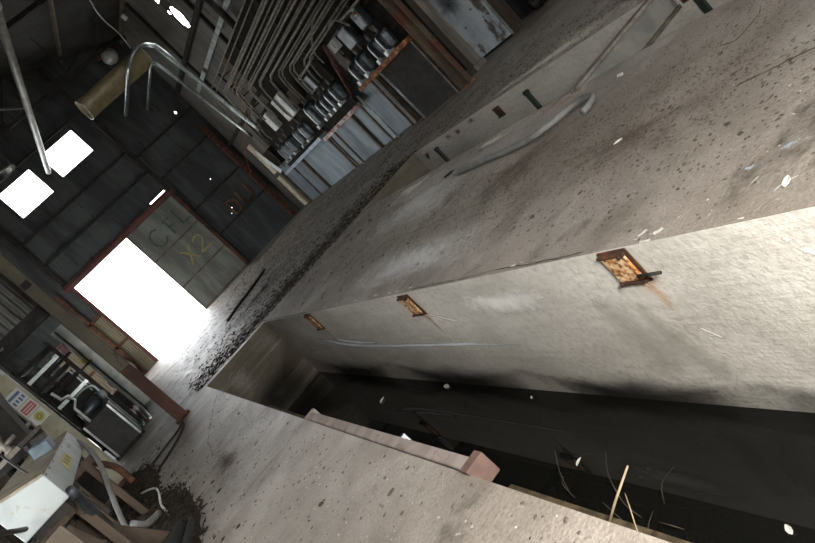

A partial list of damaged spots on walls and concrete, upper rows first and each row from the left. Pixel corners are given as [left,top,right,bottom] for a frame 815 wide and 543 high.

crack [734,47,815,87]